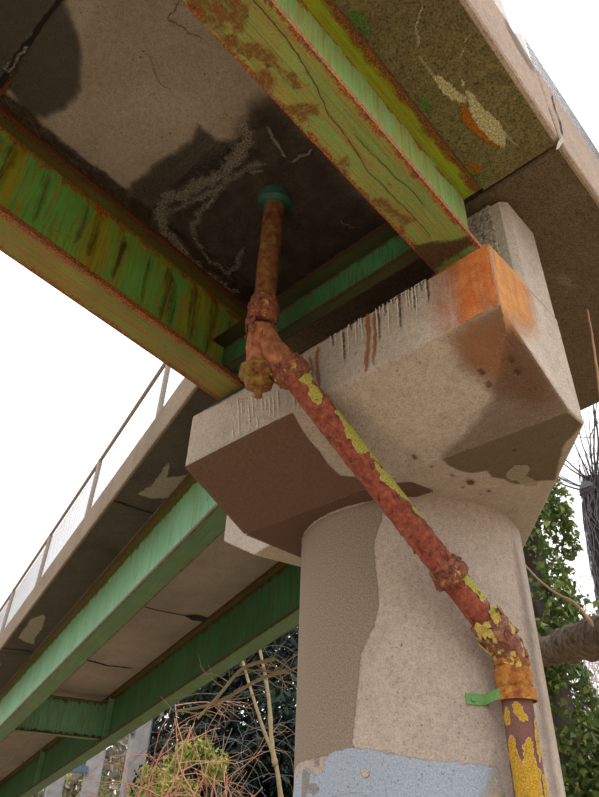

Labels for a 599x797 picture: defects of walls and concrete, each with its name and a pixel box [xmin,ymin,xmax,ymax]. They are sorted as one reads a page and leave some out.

crack [0,0,63,96]
corrosion [187,0,301,89]
damp [128,101,386,296]
damp [330,317,363,362]
corrosion [364,313,377,371]
damp [375,279,429,339]
corrosion [415,237,543,401]
peeling [19,614,48,645]
crack [145,607,207,622]
corrosion [479,605,530,671]